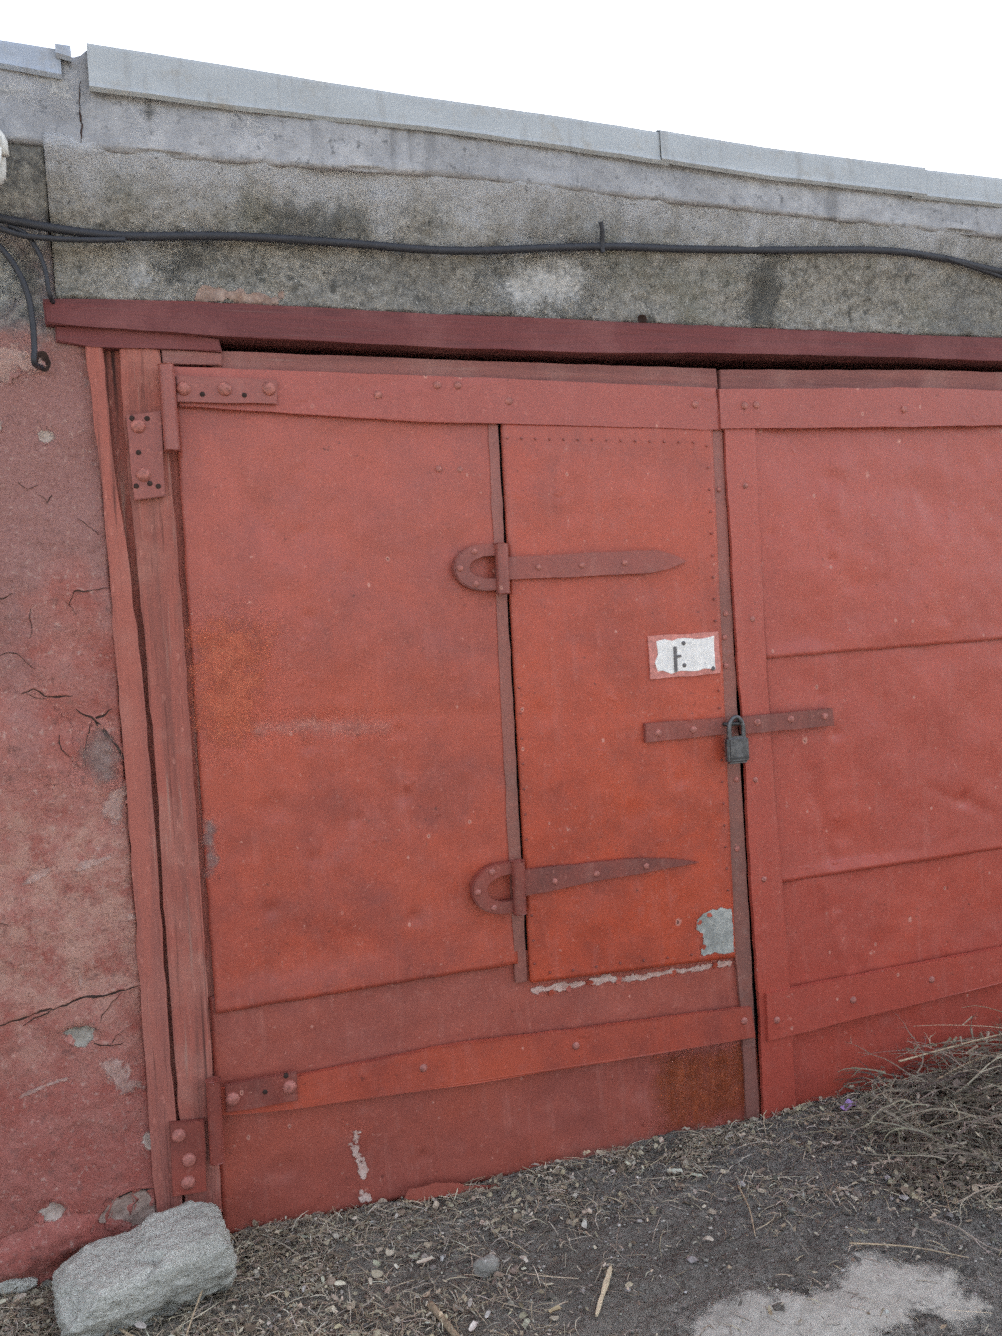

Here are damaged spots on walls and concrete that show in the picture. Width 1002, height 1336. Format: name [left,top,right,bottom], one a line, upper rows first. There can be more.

crack [77,81,85,142]
leakage [506,259,585,309]
peeling [0,344,53,384]
crack [65,587,111,615]
crack [0,592,124,766]
peeling [531,907,735,996]
crack [0,982,141,1048]
flaking render [64,1026,101,1047]
corrosion [657,1049,744,1125]
peeling [348,1130,372,1203]
flaking render [33,1199,65,1224]
flaking render [99,1188,157,1232]